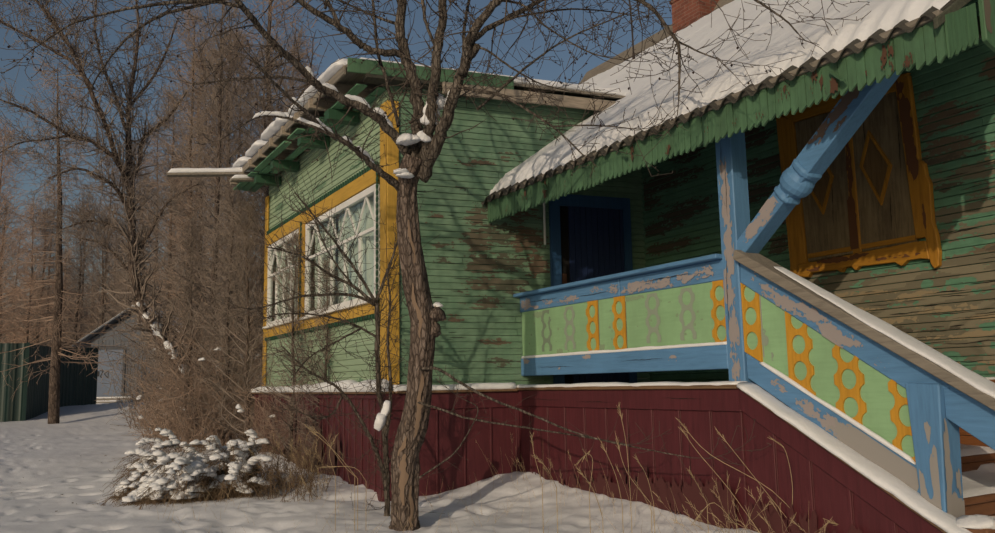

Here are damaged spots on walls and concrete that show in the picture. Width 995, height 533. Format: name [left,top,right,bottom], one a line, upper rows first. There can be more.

peeling [665,144,706,164]
peeling [745,112,781,243]
peeling [806,71,859,149]
peeling [880,45,937,181]
peeling [429,186,550,324]
peeling [719,160,741,381]
peeling [802,143,995,374]